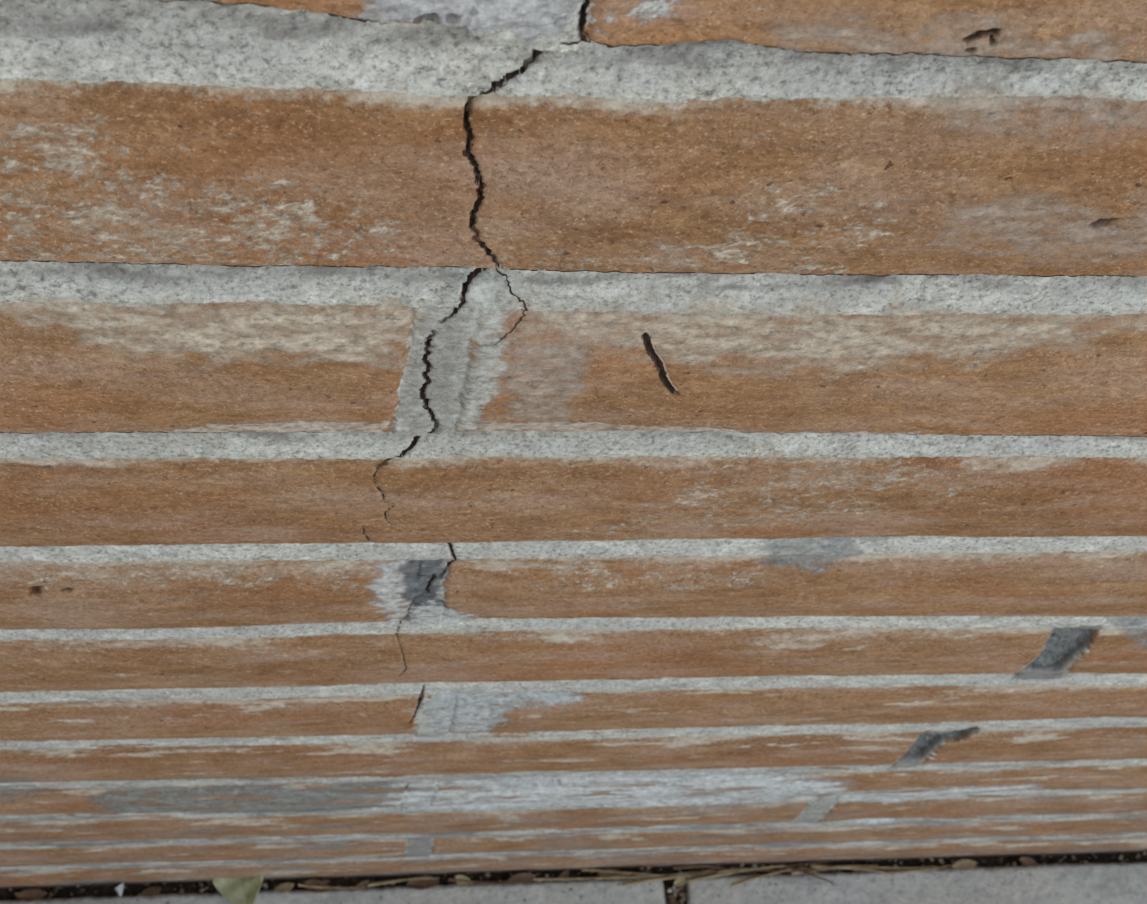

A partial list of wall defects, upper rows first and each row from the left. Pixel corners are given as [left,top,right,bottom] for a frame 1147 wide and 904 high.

crack [754,44,1145,63]
crack [0,258,185,266]
crack [220,0,762,541]
crack [800,271,1133,279]
crack [885,431,1147,439]
crack [396,543,456,724]